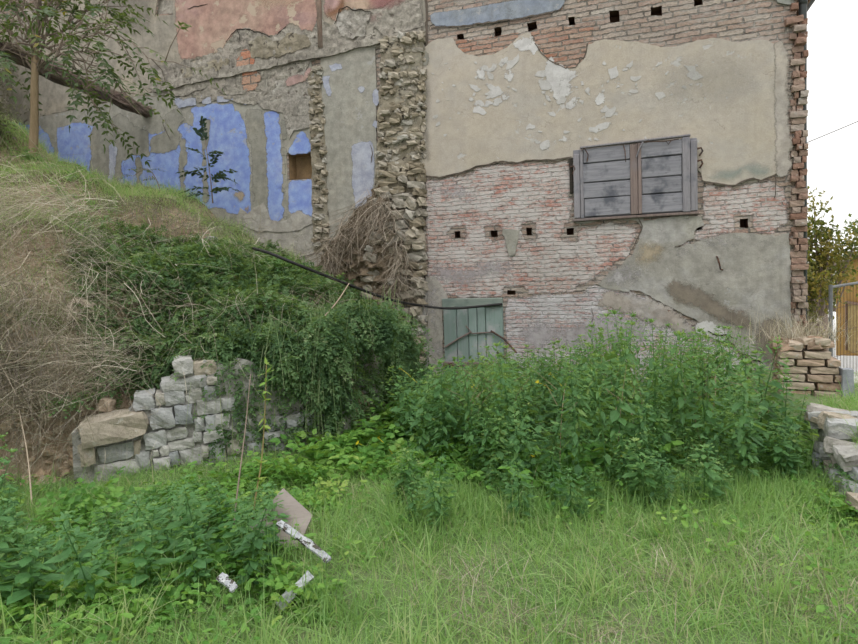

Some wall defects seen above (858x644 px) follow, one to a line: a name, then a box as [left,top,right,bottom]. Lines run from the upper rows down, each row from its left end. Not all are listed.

flaking render [336,10,370,39]
flaking render [455,26,641,150]
flaking render [234,192,312,232]
flaking render [694,180,788,240]
flaking render [425,161,754,382]